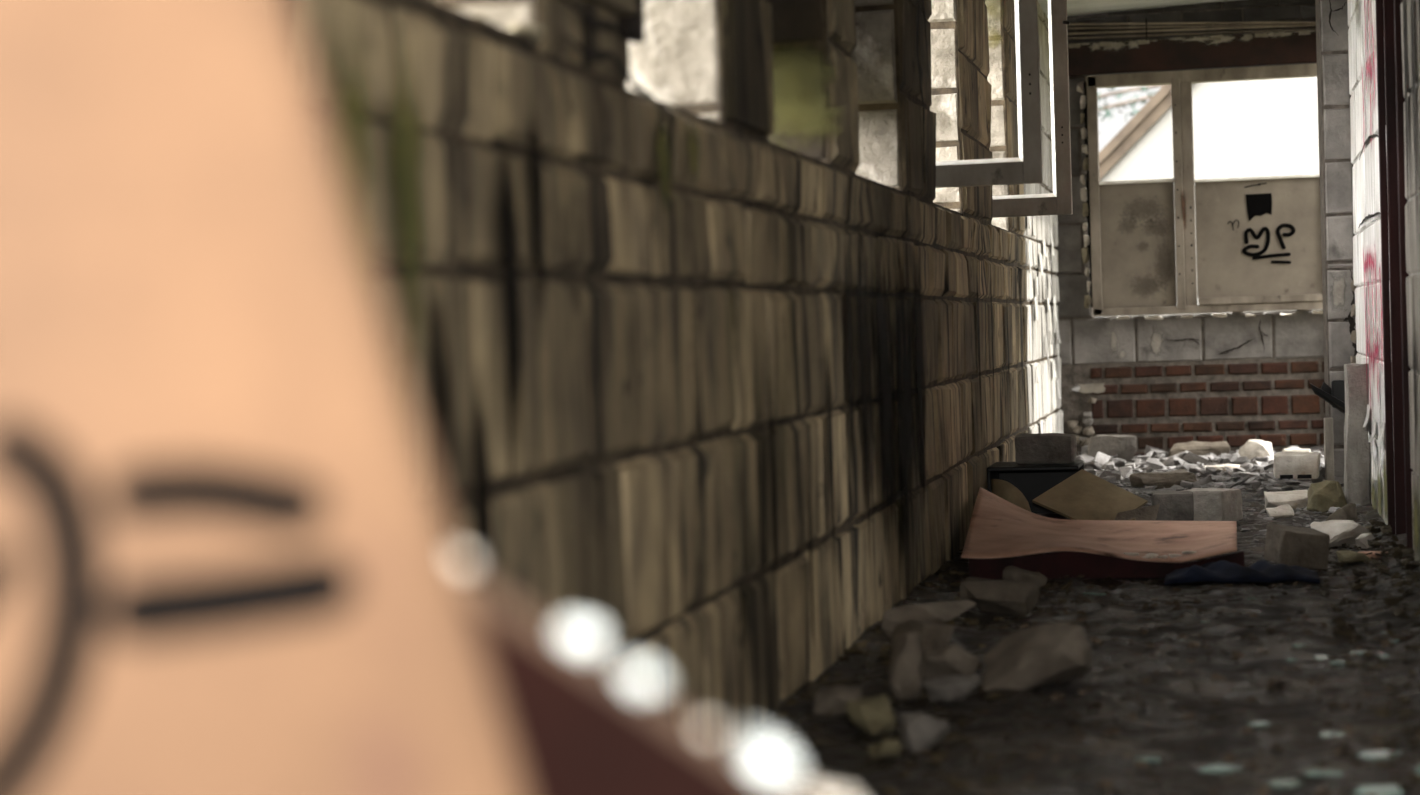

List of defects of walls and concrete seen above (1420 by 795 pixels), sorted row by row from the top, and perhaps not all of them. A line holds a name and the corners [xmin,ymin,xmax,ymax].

leakage [826,243,926,582]